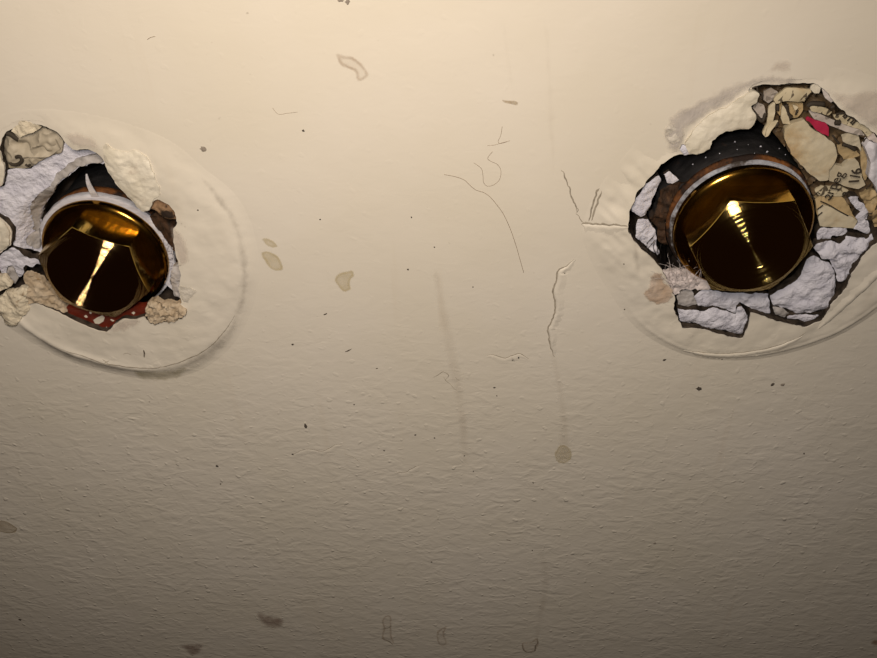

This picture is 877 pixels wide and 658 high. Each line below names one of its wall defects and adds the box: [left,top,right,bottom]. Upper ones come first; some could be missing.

peeling [670,88,739,148]
spalling [0,143,104,295]
peeling [66,286,180,327]
crack [547,259,576,357]
crack [561,170,628,235]
spalling [628,171,685,270]
spalling [674,191,877,334]